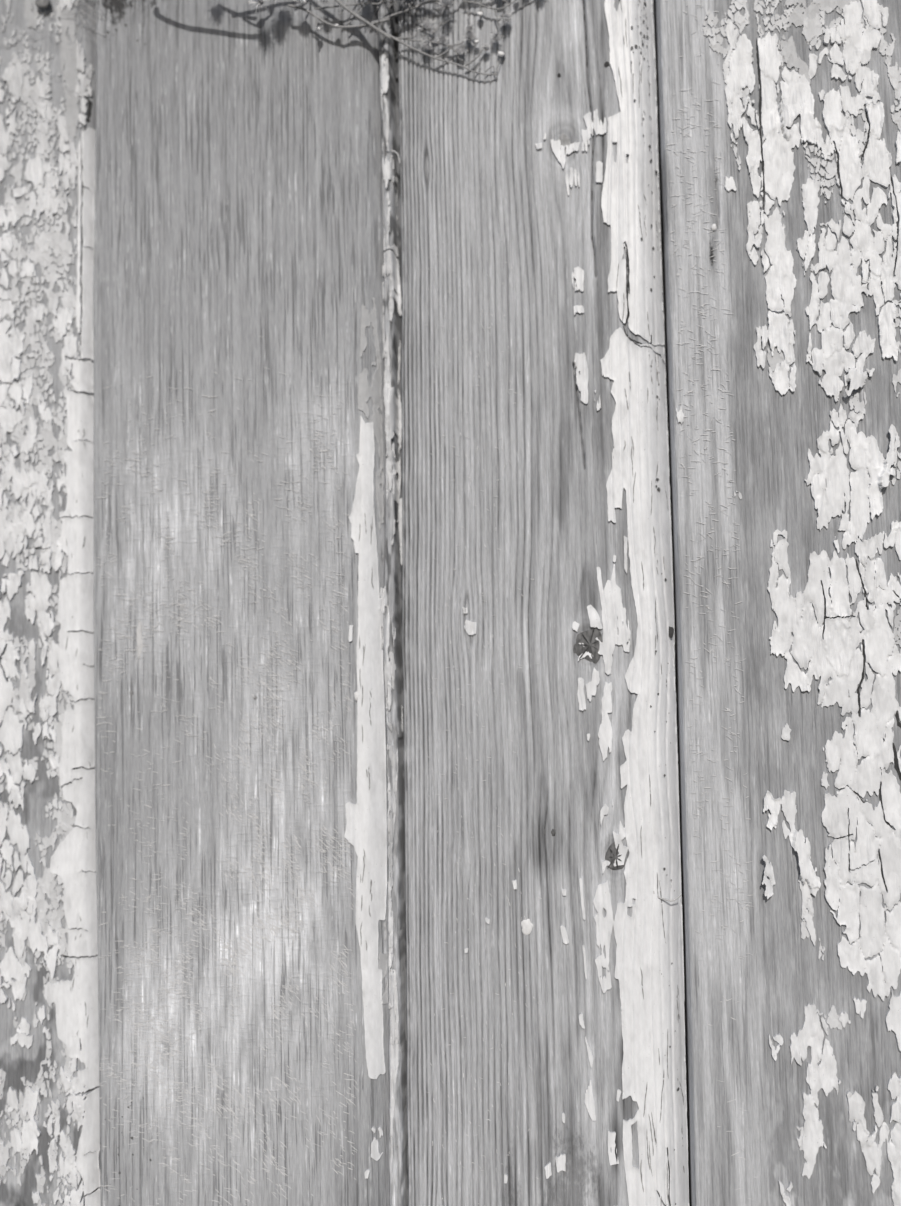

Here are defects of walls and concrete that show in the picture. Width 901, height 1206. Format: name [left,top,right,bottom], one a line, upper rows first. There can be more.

peeling [0,0,101,1206]
peeling [344,52,403,1179]
crack [583,0,594,200]
peeling [535,0,689,1206]
crack [623,244,663,361]
peeling [703,0,901,1206]